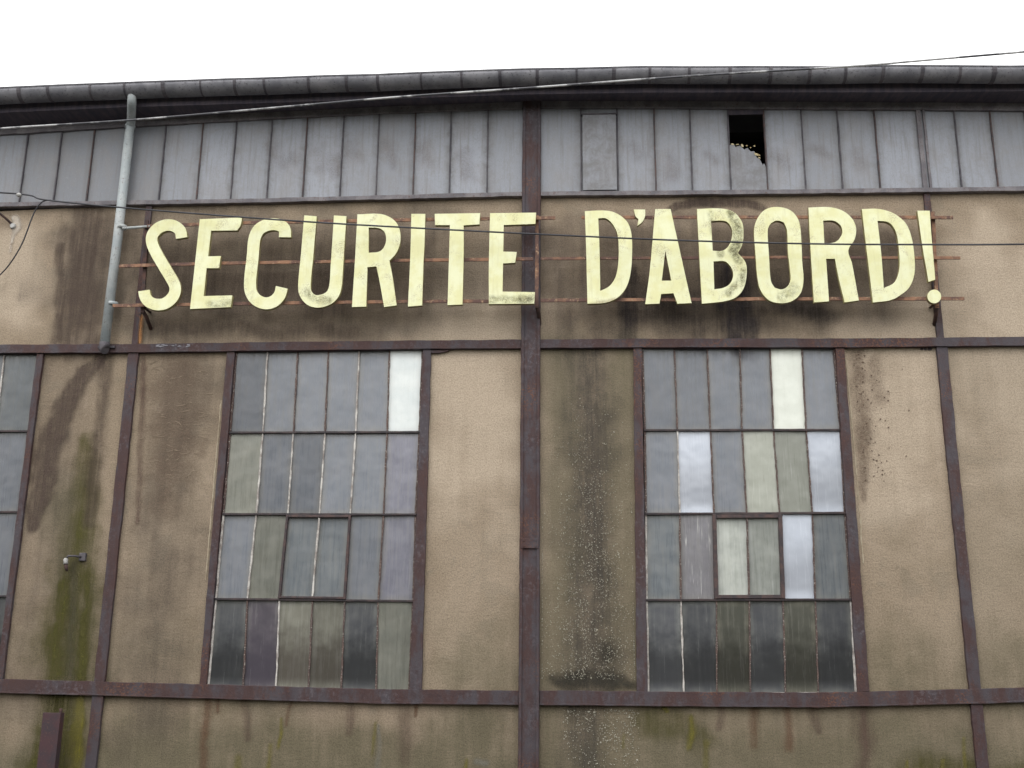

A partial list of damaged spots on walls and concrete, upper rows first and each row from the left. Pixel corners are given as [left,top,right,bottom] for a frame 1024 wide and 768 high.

water stain [27,354,106,531]
water stain [541,350,637,690]
water stain [563,707,639,768]